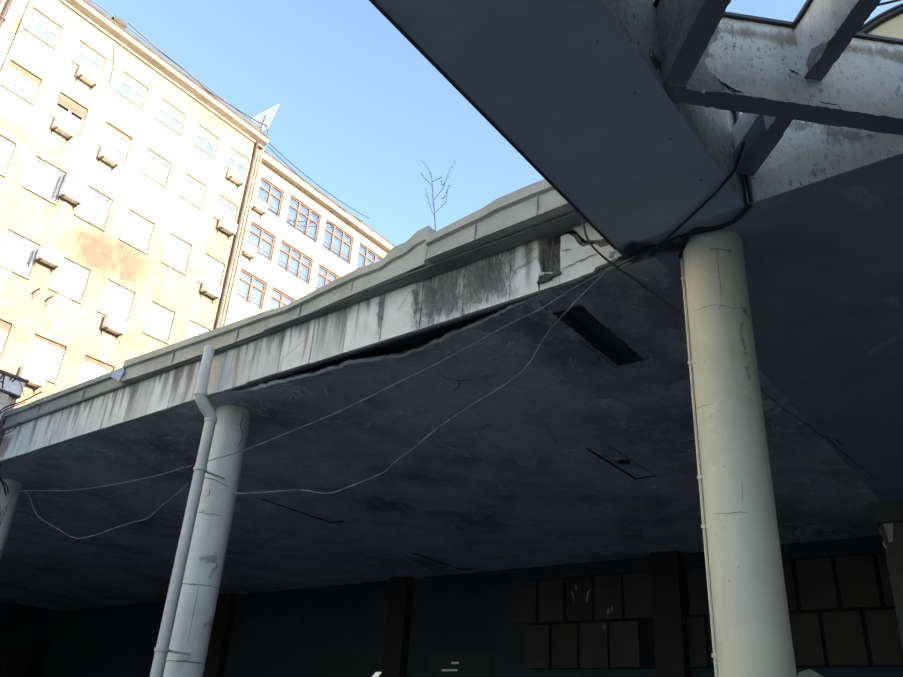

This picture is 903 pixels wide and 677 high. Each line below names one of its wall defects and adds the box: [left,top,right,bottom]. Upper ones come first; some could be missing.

peeling [686,26,726,93]
spalling [806,40,827,70]
peeling [0,0,251,271]
water stain [412,251,512,328]
crack [166,583,217,664]